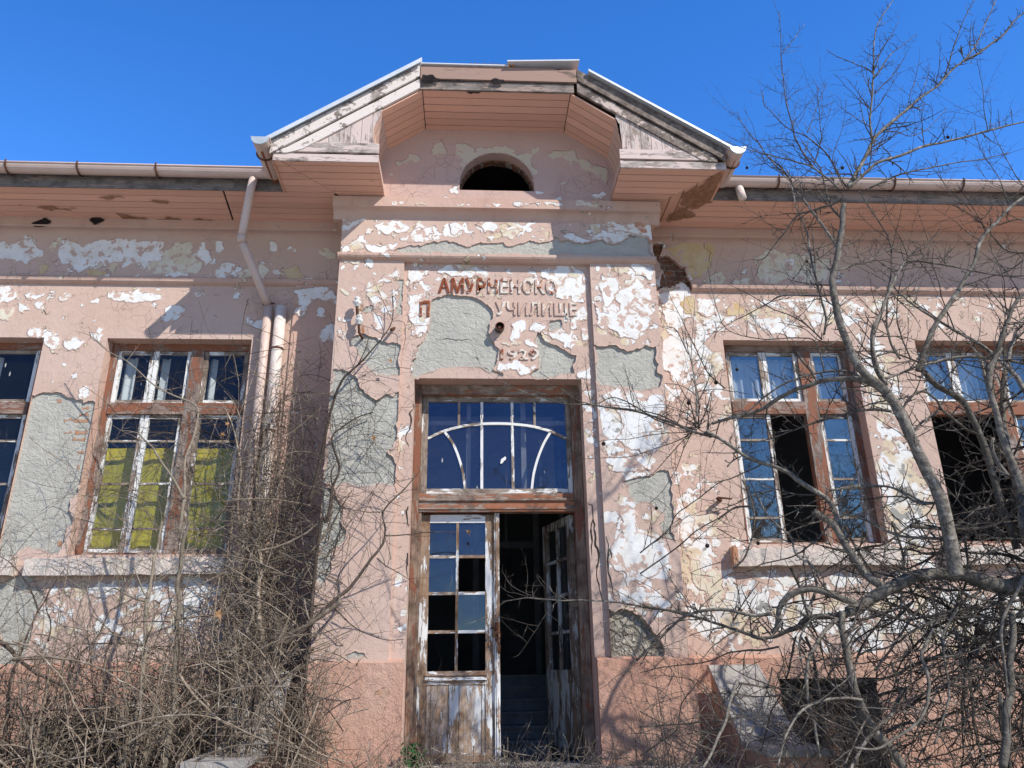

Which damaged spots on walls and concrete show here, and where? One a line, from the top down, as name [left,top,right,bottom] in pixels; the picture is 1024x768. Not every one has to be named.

spalling [0,217,832,664]
peeling [761,567,862,616]
peeling [821,607,858,633]
peeling [883,602,920,638]